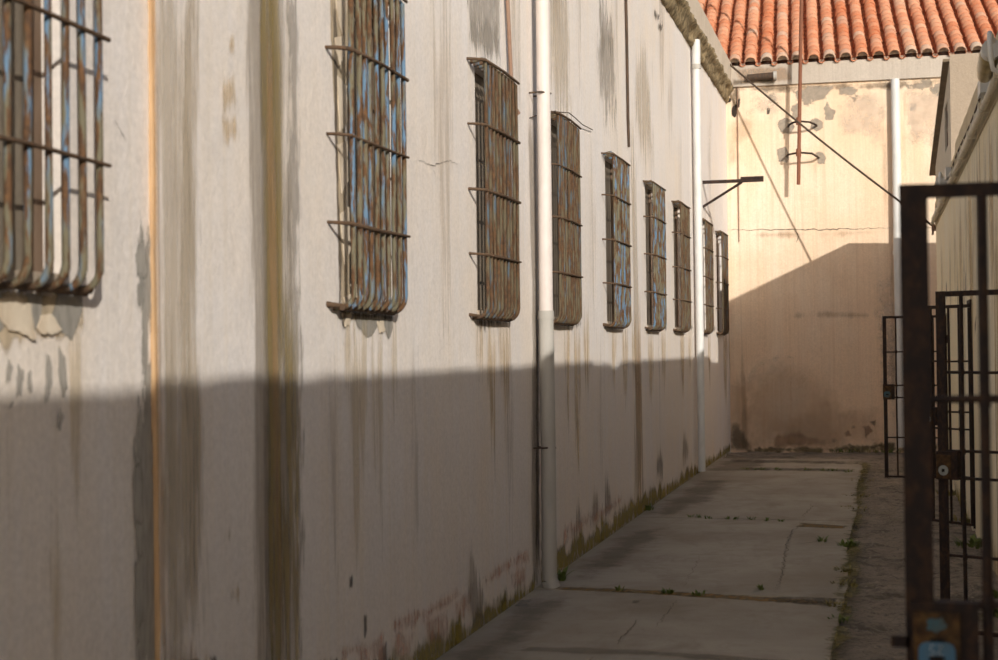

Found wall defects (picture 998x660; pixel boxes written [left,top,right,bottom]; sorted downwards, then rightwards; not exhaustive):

peeling [795,86,858,105]
peeling [0,291,84,430]
water stain [732,426,747,448]